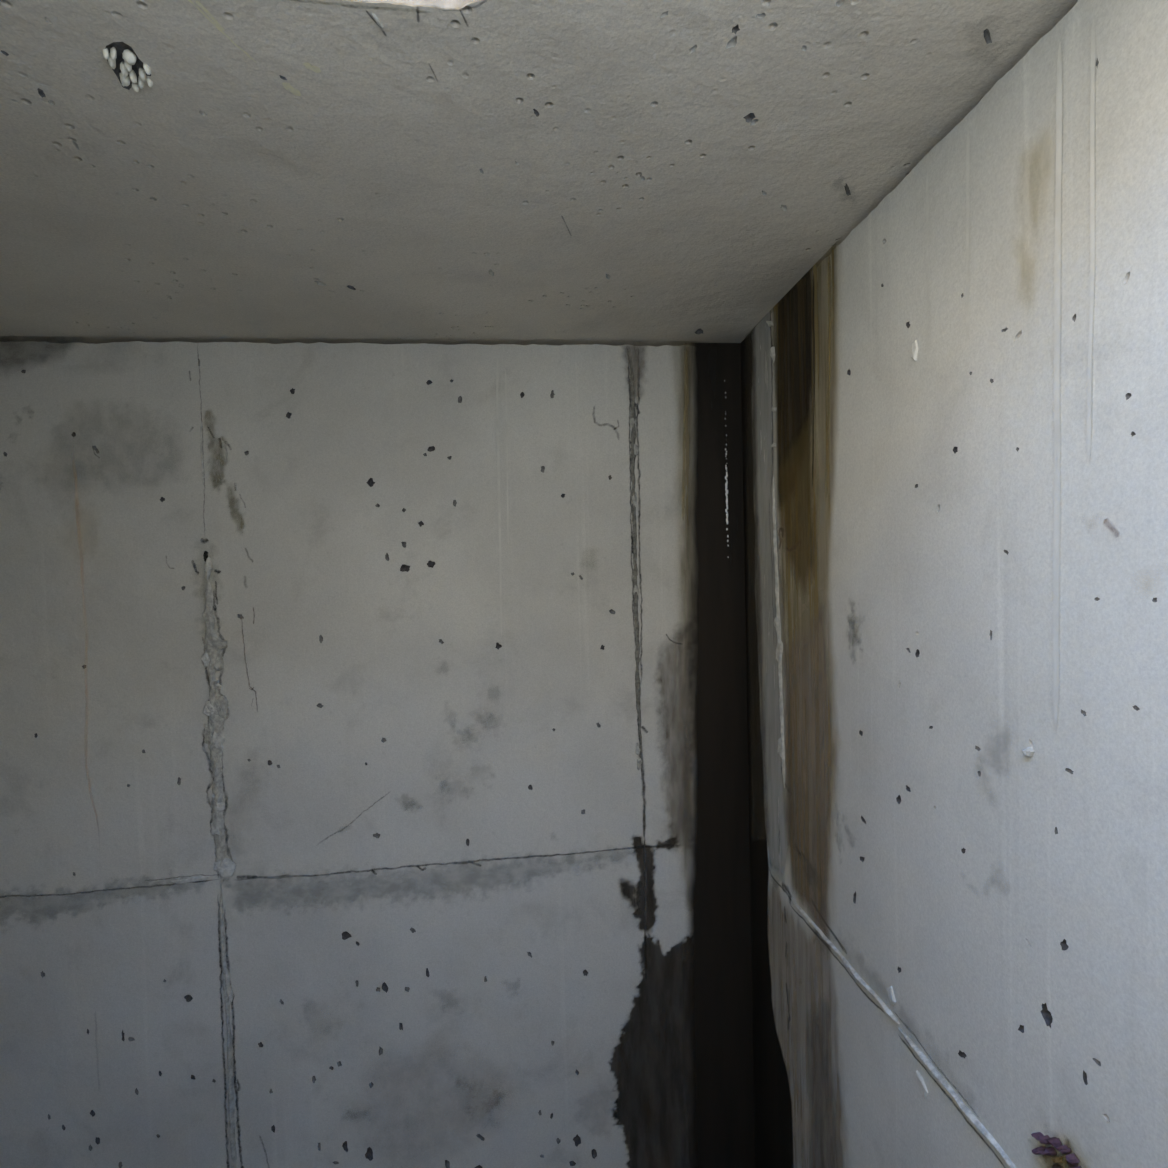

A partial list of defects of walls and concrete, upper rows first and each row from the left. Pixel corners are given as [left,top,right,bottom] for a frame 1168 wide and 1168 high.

spalling [103,42,153,92]
crack [0,366,656,898]
leakage [609,330,793,1168]
crack [771,875,882,1010]
crack [218,913,244,1168]
crack [901,1025,1005,1167]
rust [1031,1132,1082,1168]